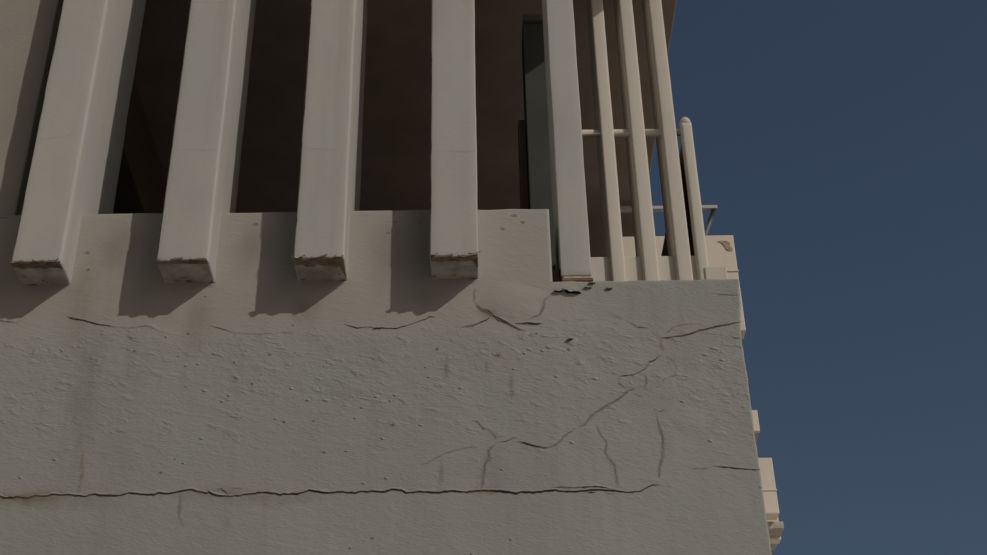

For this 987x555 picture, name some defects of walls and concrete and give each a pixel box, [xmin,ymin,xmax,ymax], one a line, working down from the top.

crack [66,316,135,339]
crack [345,316,432,329]
crack [465,295,579,337]
crack [606,294,741,406]
crack [0,420,662,499]
crack [719,465,760,488]